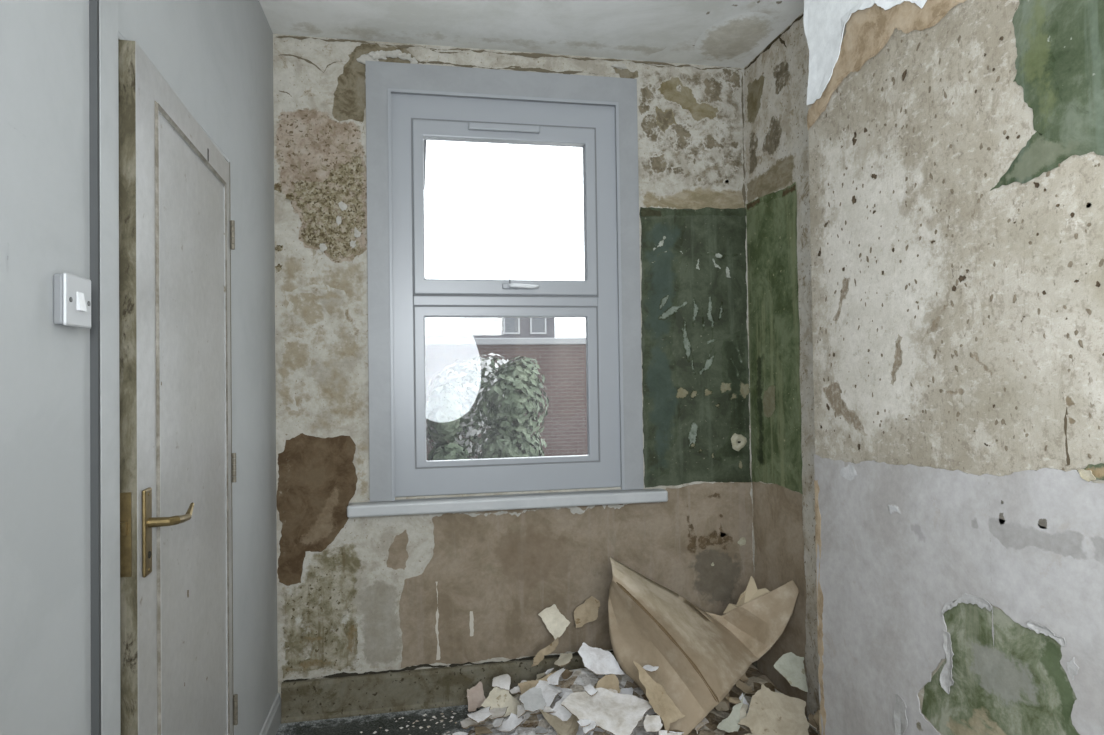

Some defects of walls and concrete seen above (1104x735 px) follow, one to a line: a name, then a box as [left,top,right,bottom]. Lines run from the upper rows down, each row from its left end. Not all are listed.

flaking render [274,42,422,263]
flaking render [1021,163,1092,219]
peeling [676,381,750,409]
peeling [808,78,978,462]
flaking render [1053,305,1083,373]
flaking render [1067,258,1104,288]
flaking render [276,433,370,586]
flaking render [386,480,826,735]
peeling [893,593,1080,735]